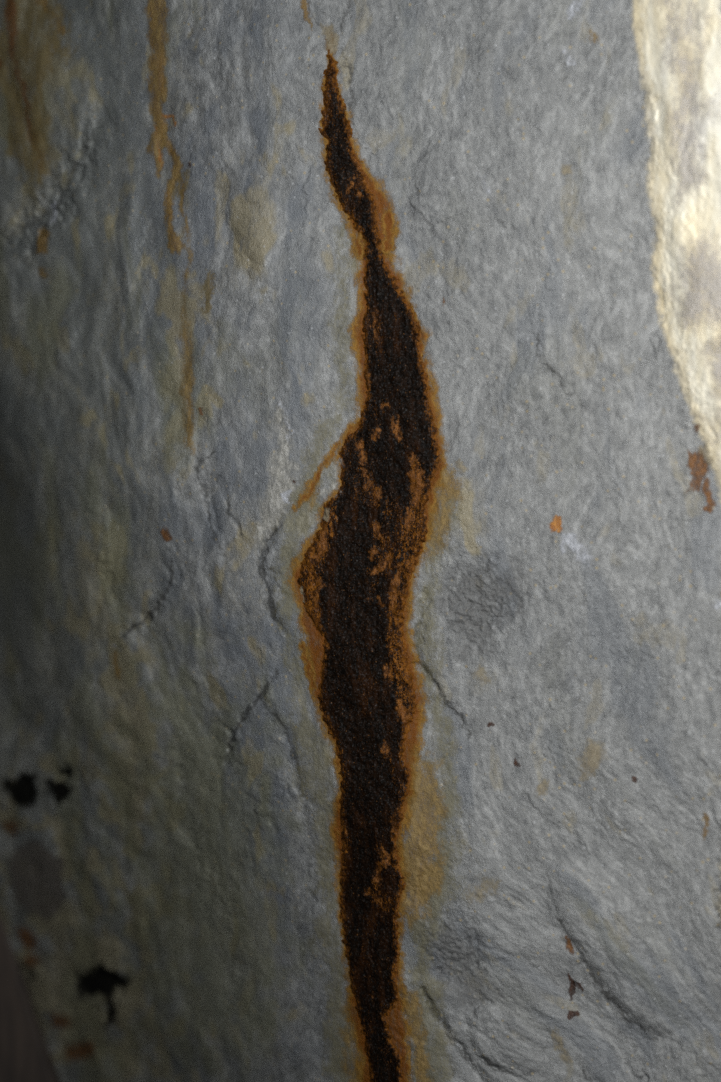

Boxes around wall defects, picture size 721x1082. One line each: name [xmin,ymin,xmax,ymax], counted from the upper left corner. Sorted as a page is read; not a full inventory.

rust [147,0,193,277]
rust [687,445,715,513]
rust [288,0,462,1082]
rust [550,515,562,533]
water stain [3,763,74,808]
water stain [73,963,131,1027]